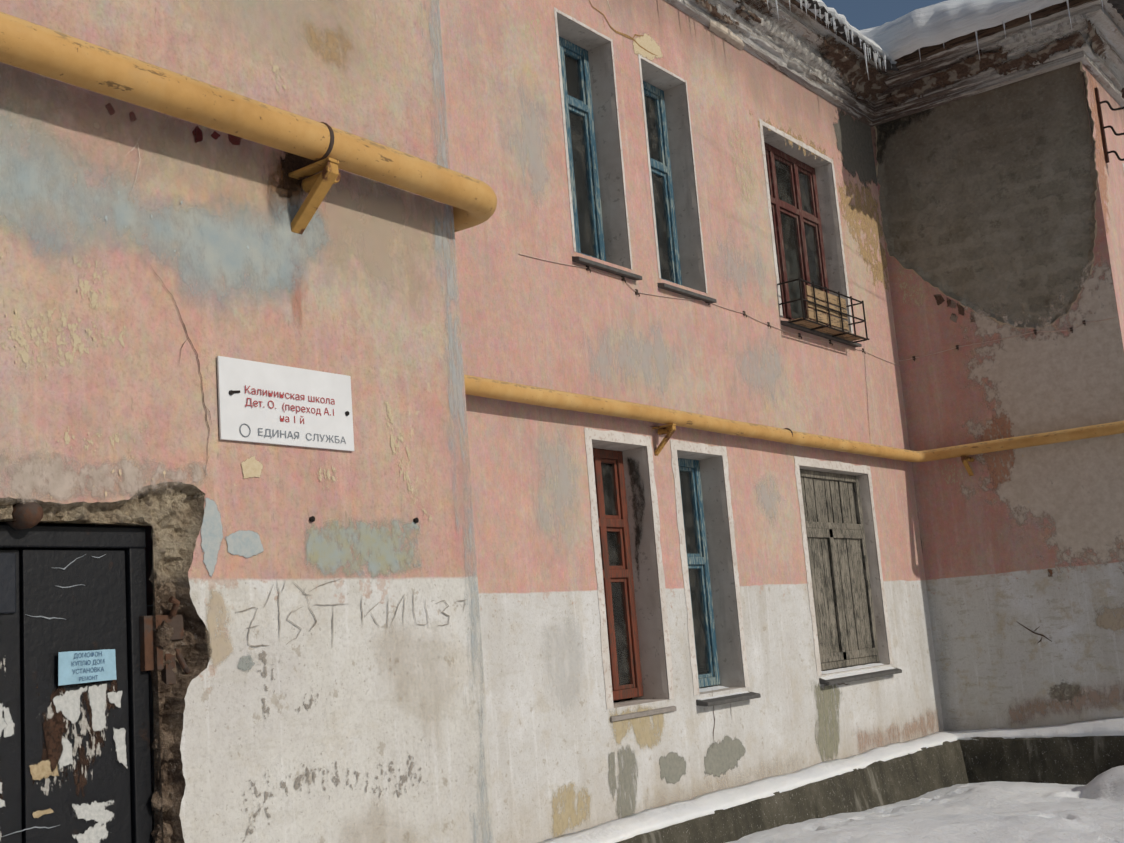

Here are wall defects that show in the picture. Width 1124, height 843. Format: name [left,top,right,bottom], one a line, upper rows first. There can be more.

crack [589,0,657,56]
peeling [633,33,663,61]
peeling [696,0,1124,572]
crack [152,268,212,469]
peeling [306,520,420,577]
spalling [0,453,264,843]
peeling [258,650,275,719]
peeling [613,707,664,748]